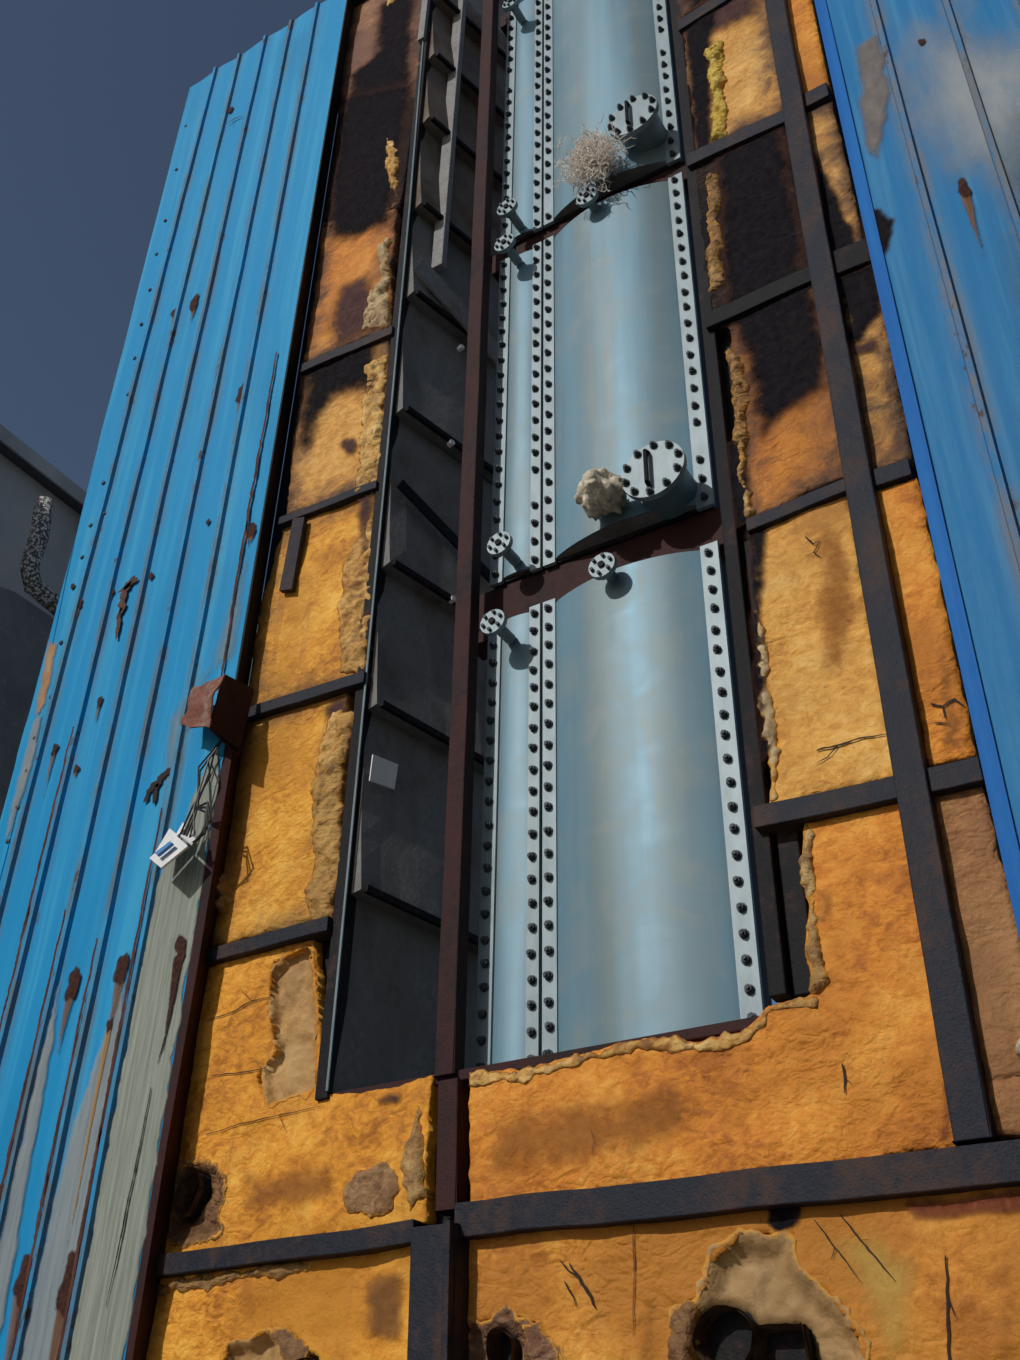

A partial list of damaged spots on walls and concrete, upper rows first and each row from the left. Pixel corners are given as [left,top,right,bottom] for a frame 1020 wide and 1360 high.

corrosion [216,352,277,699]
corrosion [36,644,56,713]
peeling [0,1008,55,1328]
corrosion [0,909,66,1199]
corrosion [0,726,79,1031]
corrosion [5,938,98,1360]
corrosion [49,808,163,1360]
peeling [22,749,219,1360]
corrosion [165,935,186,1033]
spalling [261,944,326,1108]
crack [814,1214,896,1282]
crack [945,1255,956,1360]